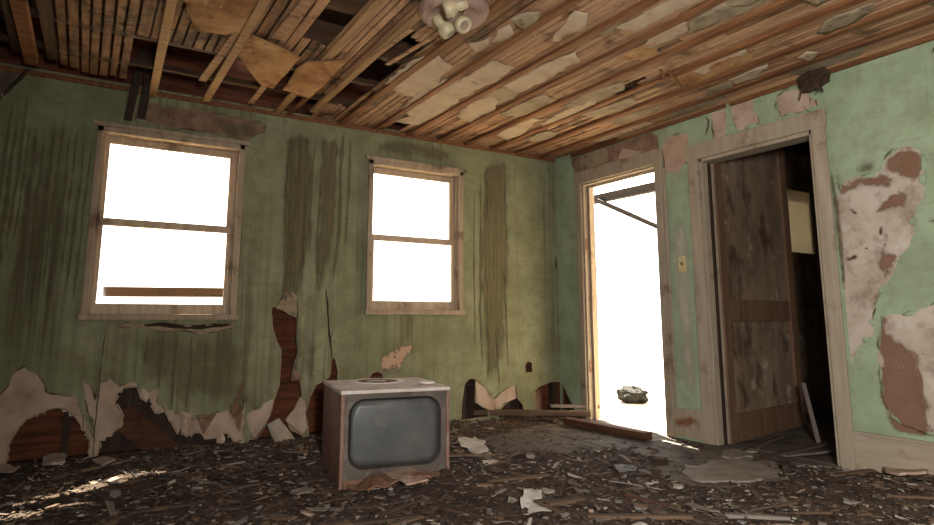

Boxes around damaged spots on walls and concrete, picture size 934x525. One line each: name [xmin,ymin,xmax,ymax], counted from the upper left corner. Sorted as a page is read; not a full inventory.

peeling [711,99,759,139]
peeling [774,88,819,118]
spalling [0,292,339,464]
water stain [283,137,351,299]
peeling [369,344,413,378]
water stain [473,165,508,375]
peeling [461,378,574,421]
peeling [837,146,934,436]